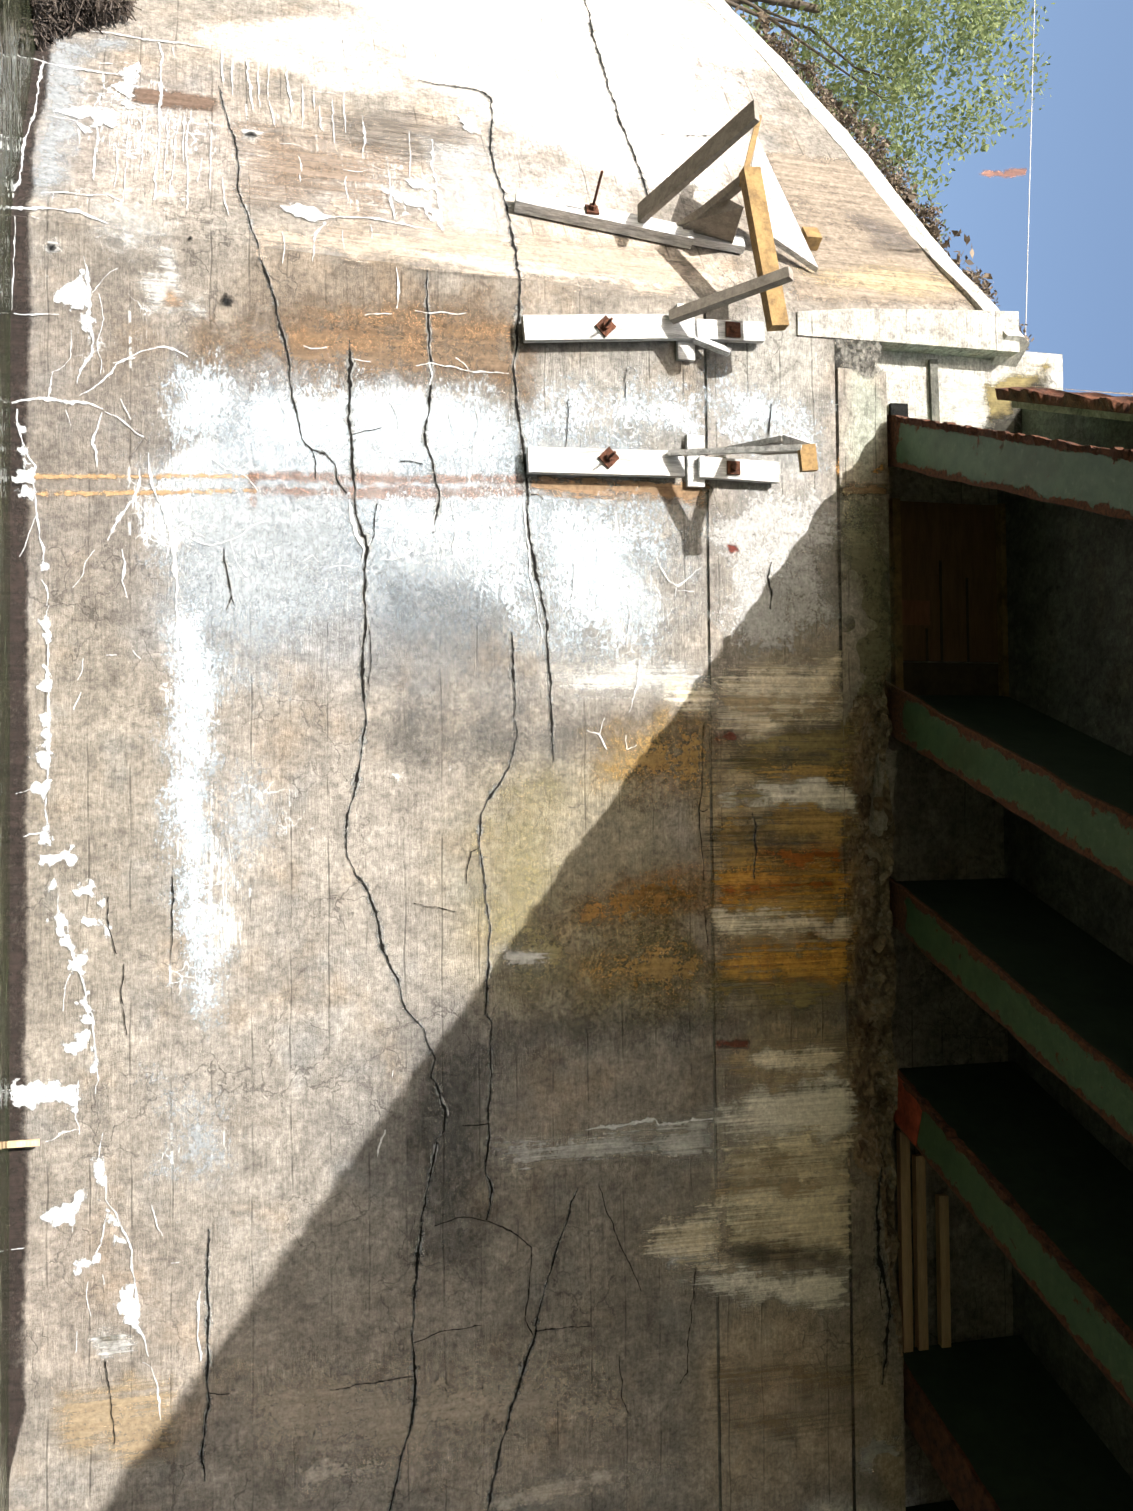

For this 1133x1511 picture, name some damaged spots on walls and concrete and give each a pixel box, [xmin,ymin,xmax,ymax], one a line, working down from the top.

corrosion [34,472,712,506]
crack [218,80,641,1511]
water stain [8,31,900,1511]
corrosion [481,780,858,1005]
spalling [841,662,904,1365]
crack [198,1229,230,1482]
crack [873,1167,893,1385]